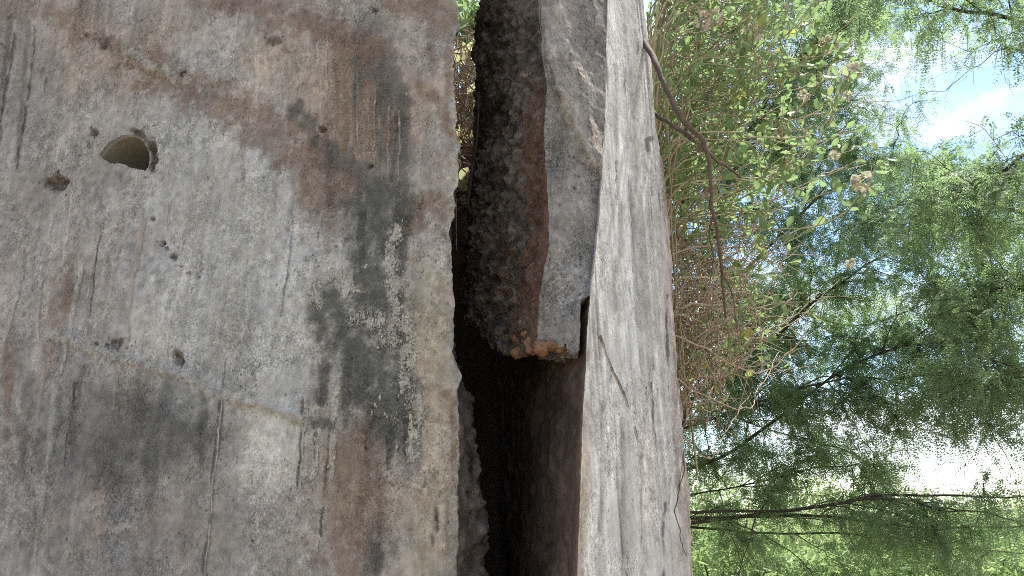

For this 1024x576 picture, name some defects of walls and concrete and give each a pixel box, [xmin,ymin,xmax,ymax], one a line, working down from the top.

spalling [131,125,159,178]
leakage [287,36,418,462]
crack [202,359,226,576]